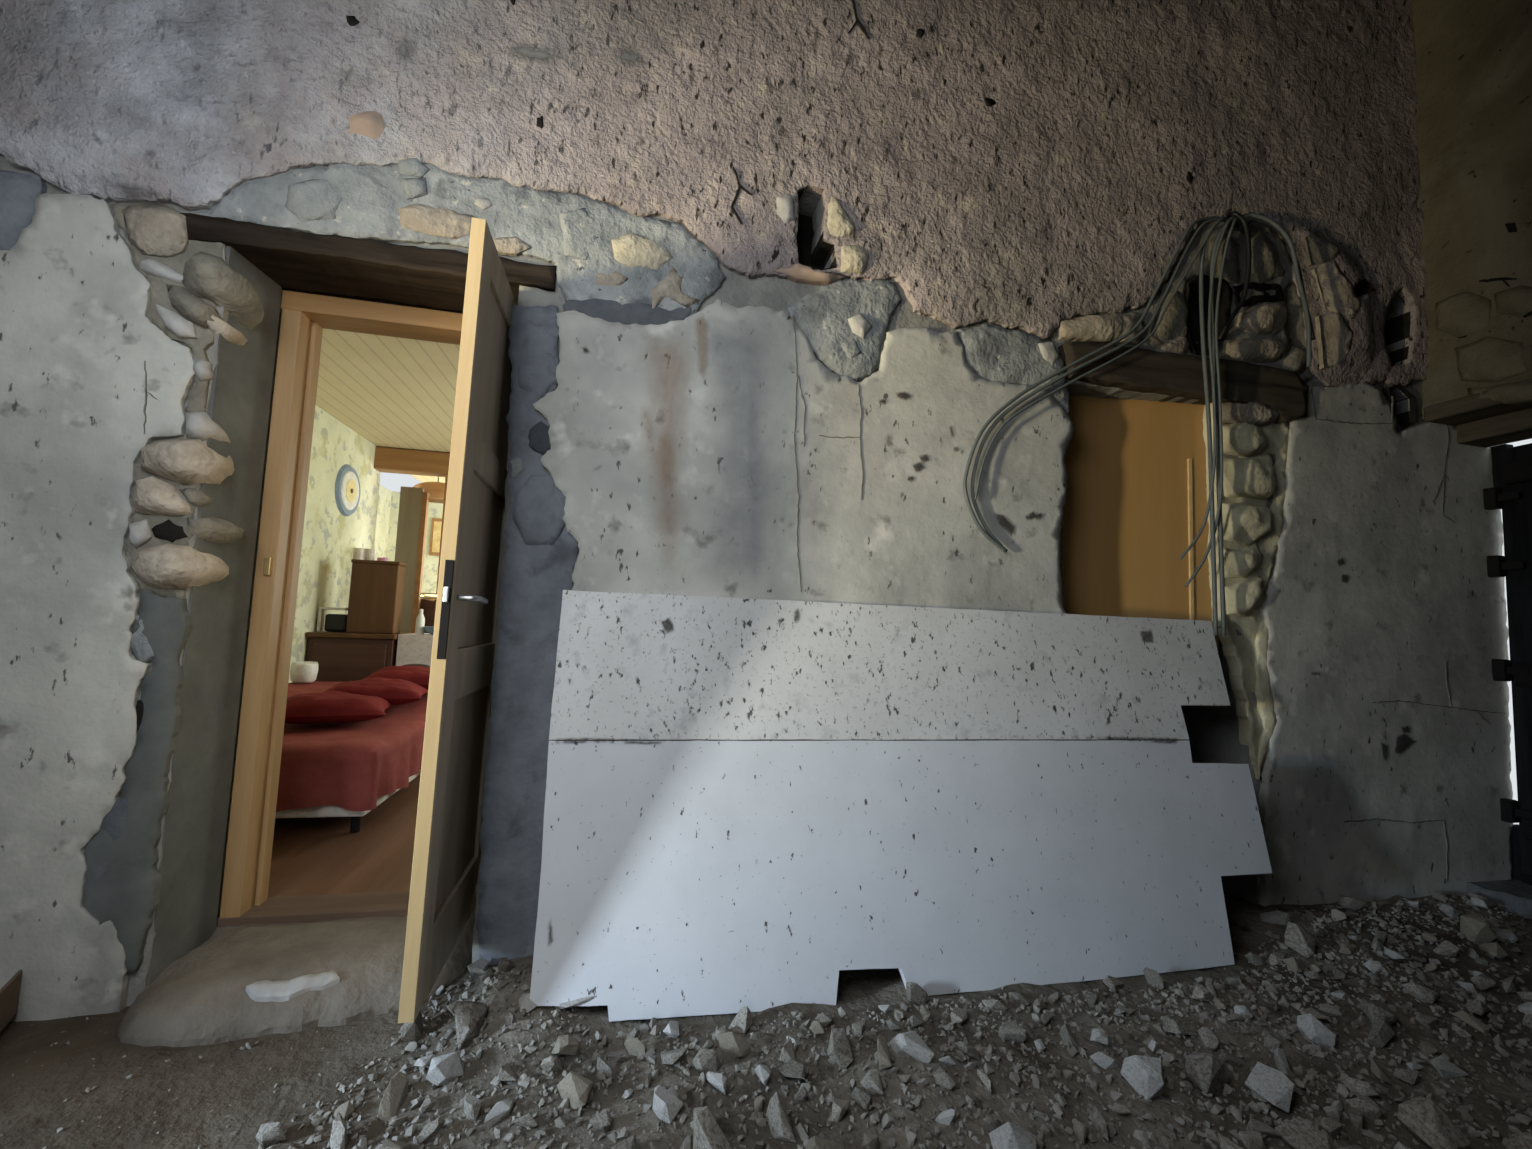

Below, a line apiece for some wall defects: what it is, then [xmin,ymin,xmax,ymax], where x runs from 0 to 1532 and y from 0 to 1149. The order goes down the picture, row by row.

spalling [776,188,869,285]
spalling [1147,215,1313,382]
flaking render [195,158,726,966]
peeling [136,700,144,731]